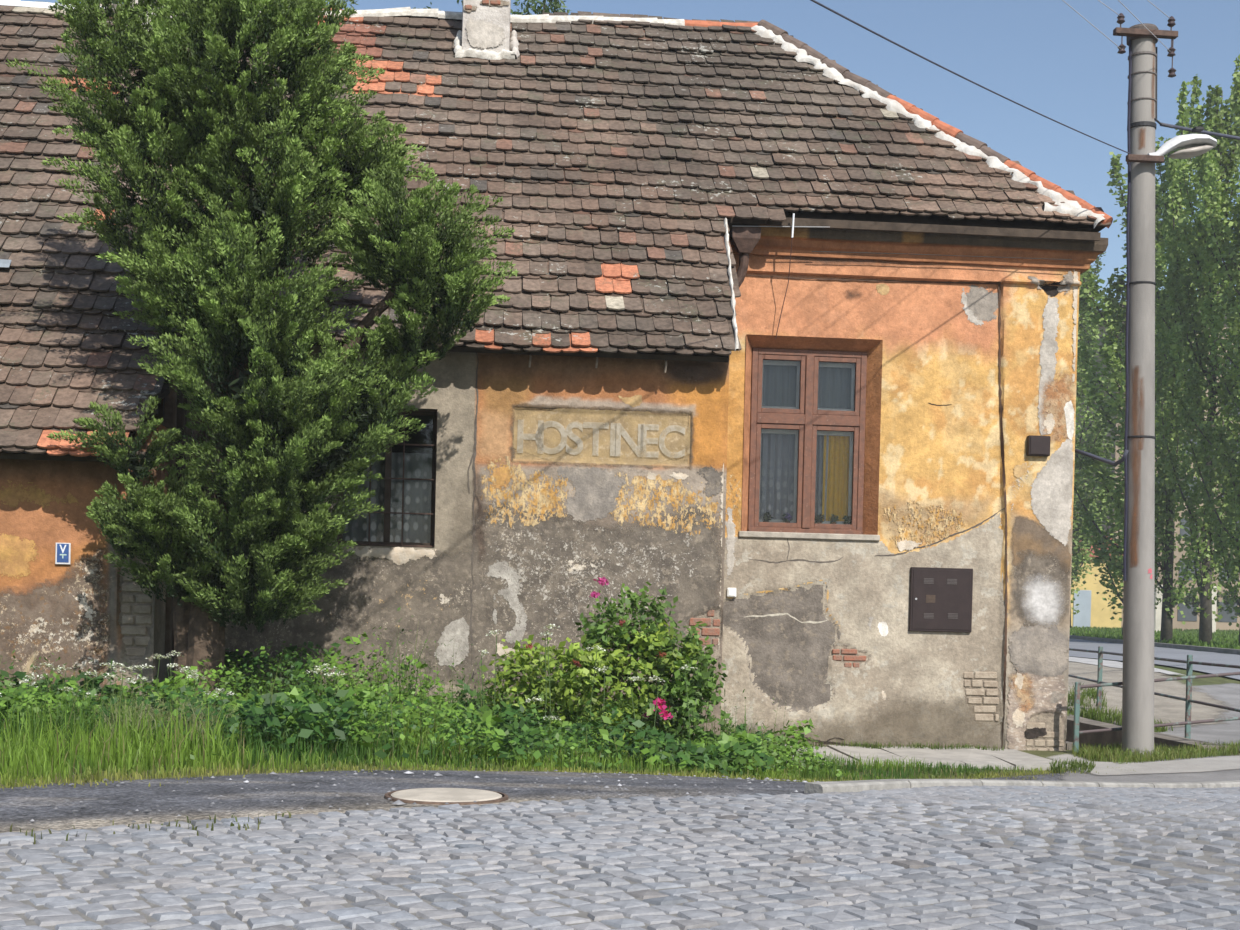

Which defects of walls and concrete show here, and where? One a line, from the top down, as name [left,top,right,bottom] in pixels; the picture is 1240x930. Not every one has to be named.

spalling [961,285,999,326]
peeling [1028,269,1080,441]
peeling [0,533,39,581]
spalling [14,551,154,669]
peeling [480,456,742,656]
spalling [688,564,869,713]
crack [745,275,1008,747]
spalling [961,670,1067,751]
damp [1011,516,1071,627]
corrosion [1131,367,1143,566]